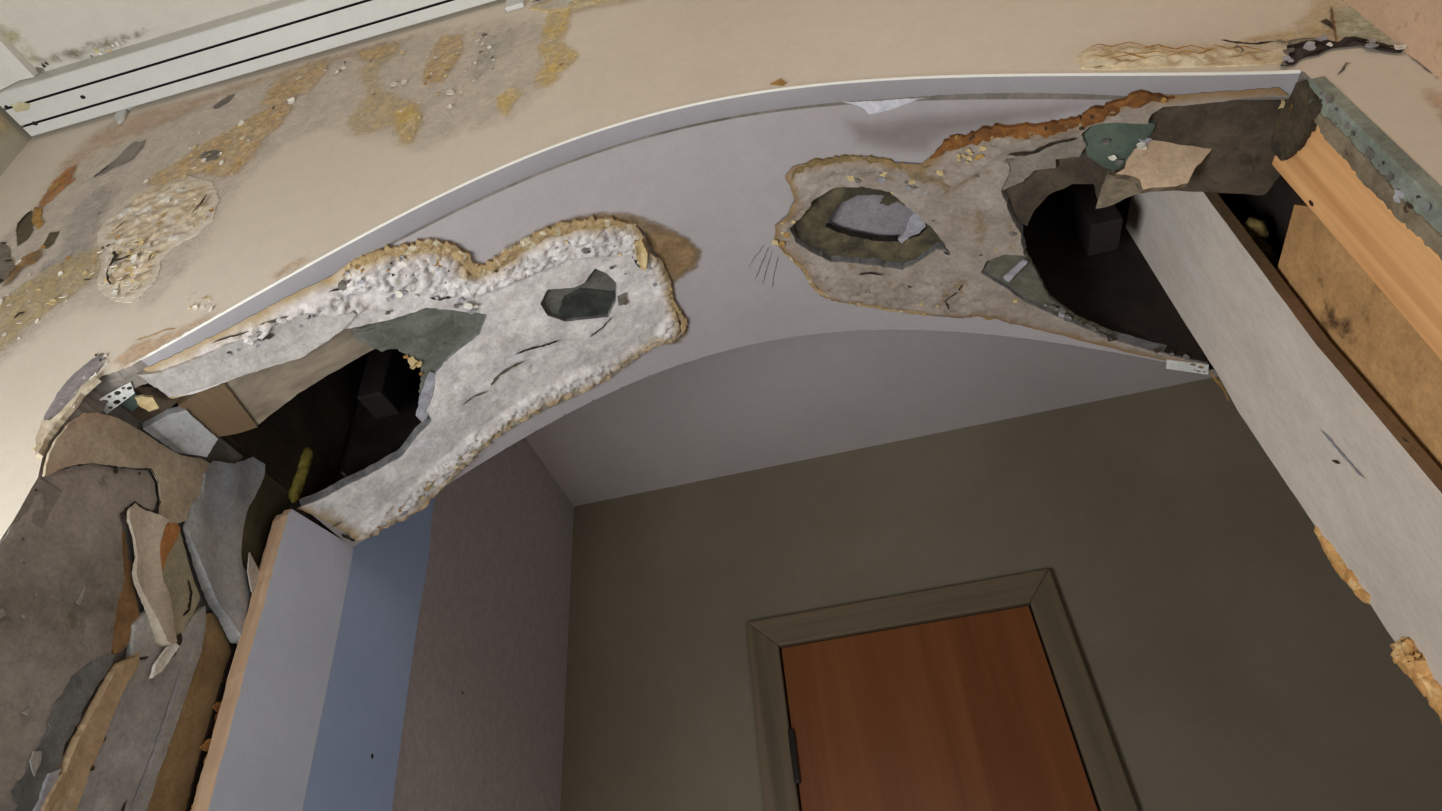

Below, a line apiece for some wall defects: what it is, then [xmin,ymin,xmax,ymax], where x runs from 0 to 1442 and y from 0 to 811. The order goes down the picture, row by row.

crack [1275,6,1438,78]
flaking render [1334,8,1398,45]
peeling [774,87,1289,368]
peeling [137,215,688,542]
spalling [0,353,265,811]